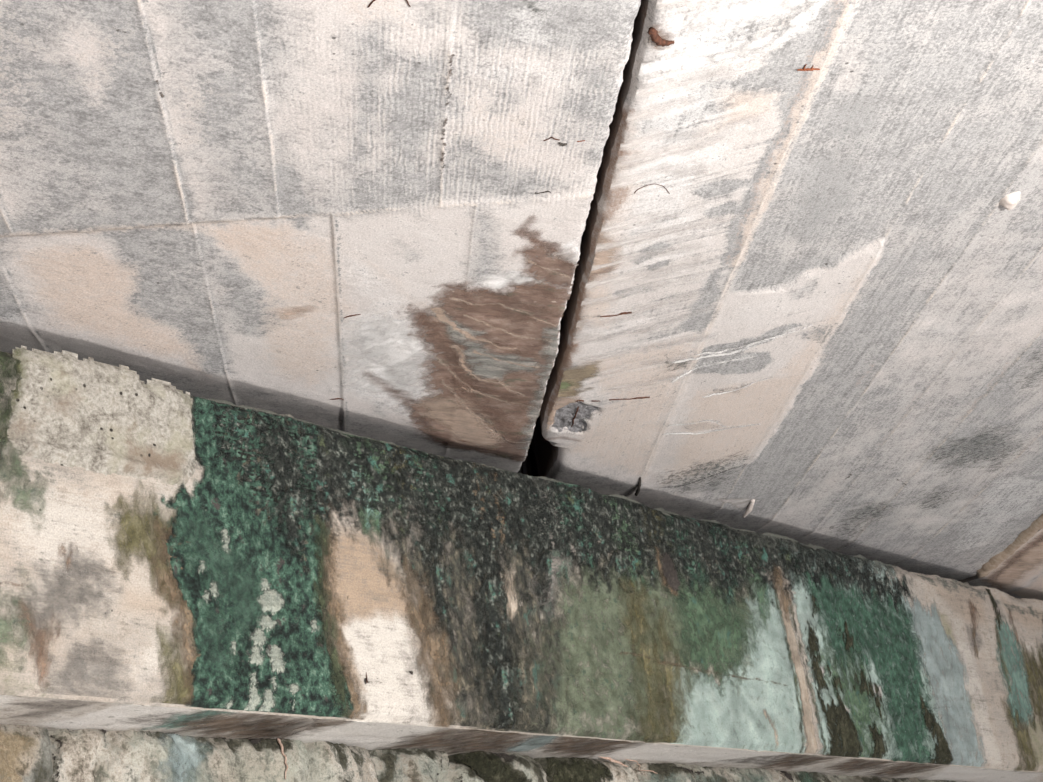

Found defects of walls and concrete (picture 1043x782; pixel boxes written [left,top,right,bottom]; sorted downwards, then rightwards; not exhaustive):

corrosion [647,27,675,49]
water stain [638,0,827,76]
water stain [341,229,642,462]
water stain [666,325,811,383]
spalling [551,401,600,433]
water stain [0,452,45,513]
water stain [658,456,736,493]
water stain [927,424,1022,476]
water stain [382,469,687,757]
water stain [167,714,348,740]
water stain [763,755,941,776]